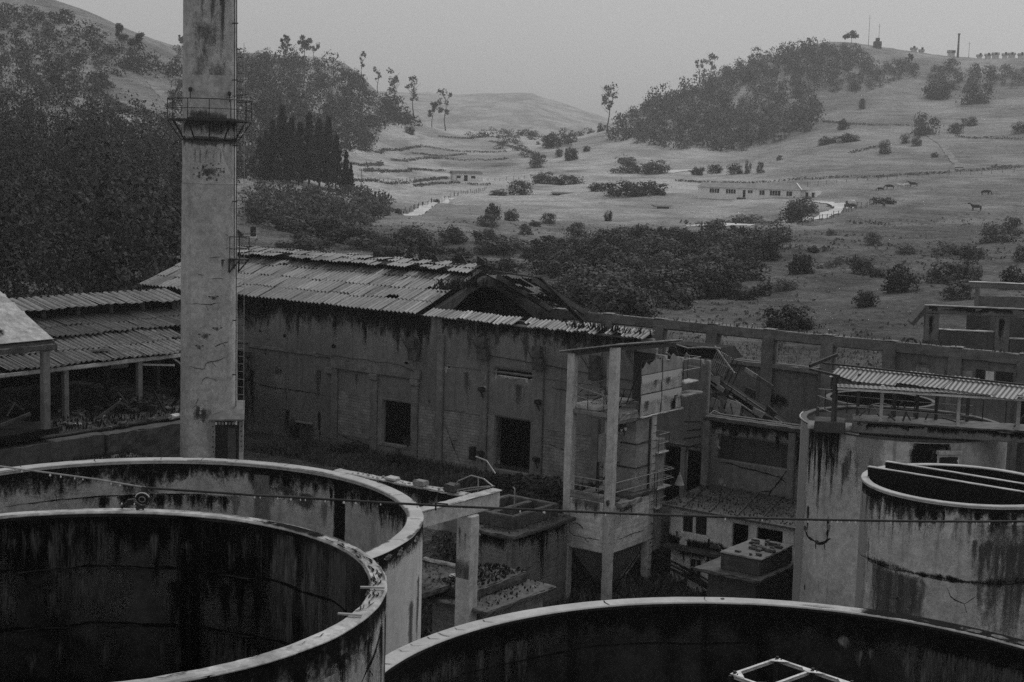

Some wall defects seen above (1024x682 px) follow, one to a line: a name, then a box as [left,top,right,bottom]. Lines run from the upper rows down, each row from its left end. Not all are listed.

water stain [195,0,225,75]
water stain [237,298,642,357]
water stain [0,421,1024,682]